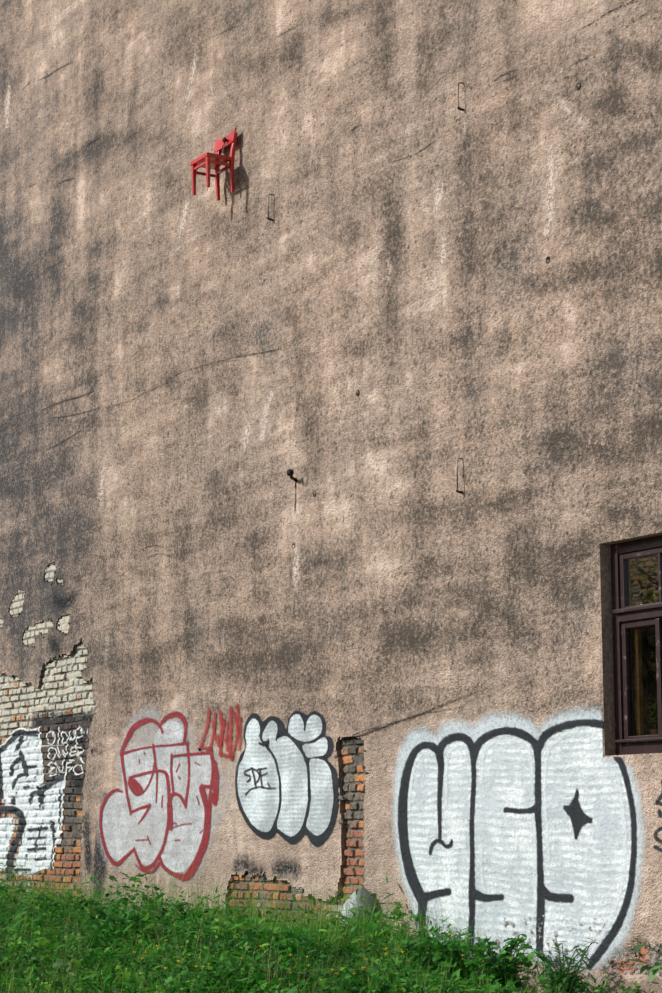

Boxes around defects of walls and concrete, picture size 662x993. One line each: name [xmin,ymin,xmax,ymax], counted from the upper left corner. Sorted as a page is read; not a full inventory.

crack [43,346,279,448]
spalling [0,590,25,627]
spalling [43,562,63,585]
spalling [0,614,98,907]
spalling [228,736,369,934]